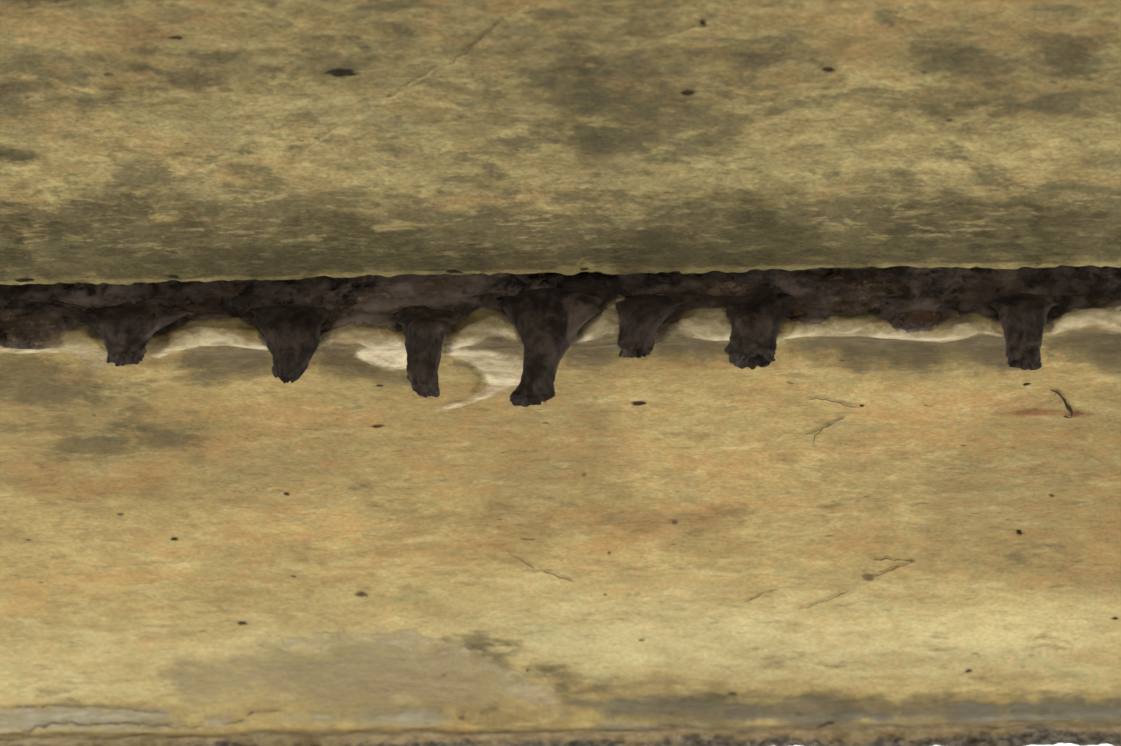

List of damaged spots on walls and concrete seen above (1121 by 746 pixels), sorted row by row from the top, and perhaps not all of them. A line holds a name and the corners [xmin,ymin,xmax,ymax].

leakage [0,310,106,366]
leakage [143,308,273,373]
leakage [316,289,410,383]
leakage [414,279,524,408]
leakage [559,236,686,365]
leakage [654,281,751,355]
leakage [777,295,1008,373]
leakage [1043,300,1121,369]